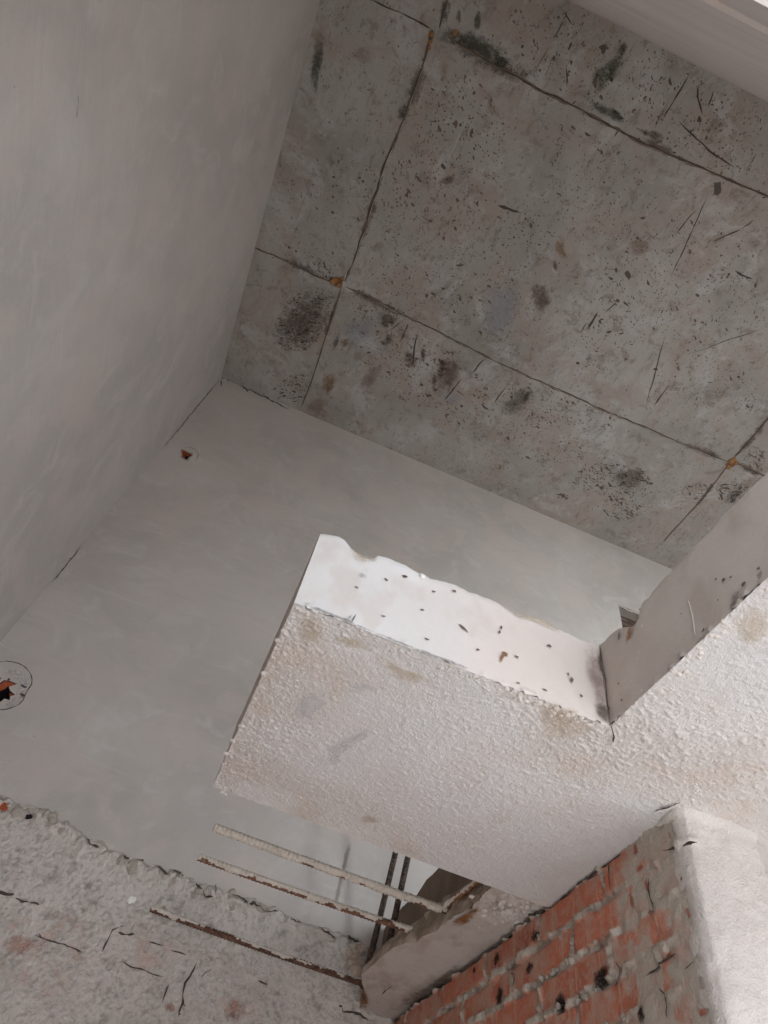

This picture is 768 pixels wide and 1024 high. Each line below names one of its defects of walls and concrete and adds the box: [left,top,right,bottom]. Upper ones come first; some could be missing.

damp [444,12,507,62]
damp [592,43,626,90]
flaking render [0,795,402,1024]